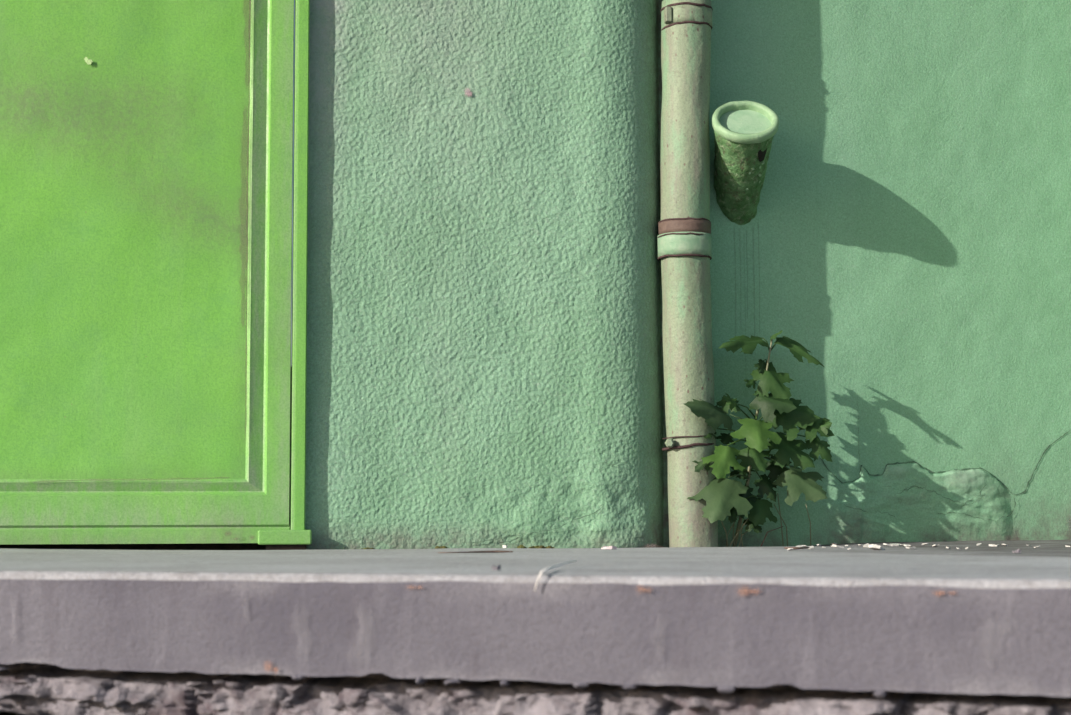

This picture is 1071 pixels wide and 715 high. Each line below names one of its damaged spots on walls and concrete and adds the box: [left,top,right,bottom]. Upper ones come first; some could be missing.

crack [820,402,1071,522]